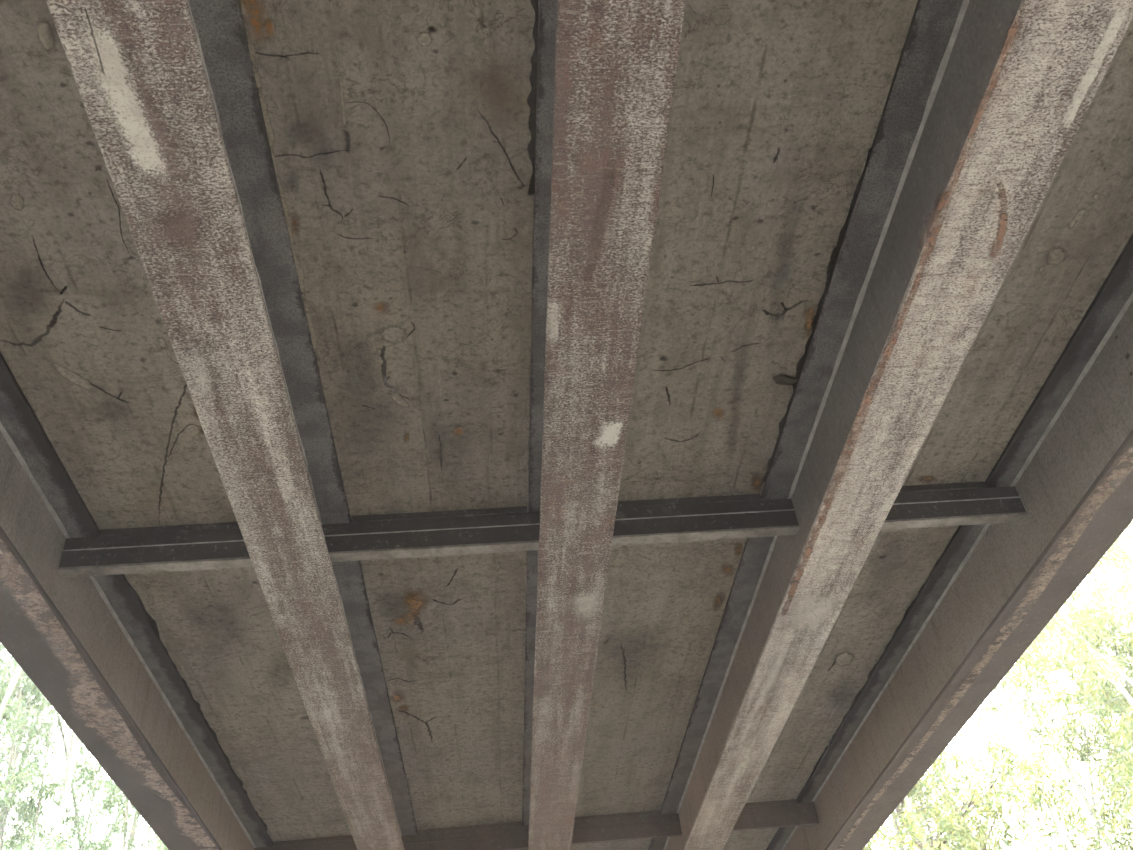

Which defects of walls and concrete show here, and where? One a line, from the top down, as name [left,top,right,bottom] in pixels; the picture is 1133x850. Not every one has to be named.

crack [275,150,371,239]
crack [477,109,526,240]
crack [3,235,122,346]
crack [362,322,415,410]
rust [782,19,1020,614]
crack [158,355,199,523]
crack [387,568,464,639]
peeling [0,538,218,850]
spalling [129,584,267,831]
crack [399,710,435,742]